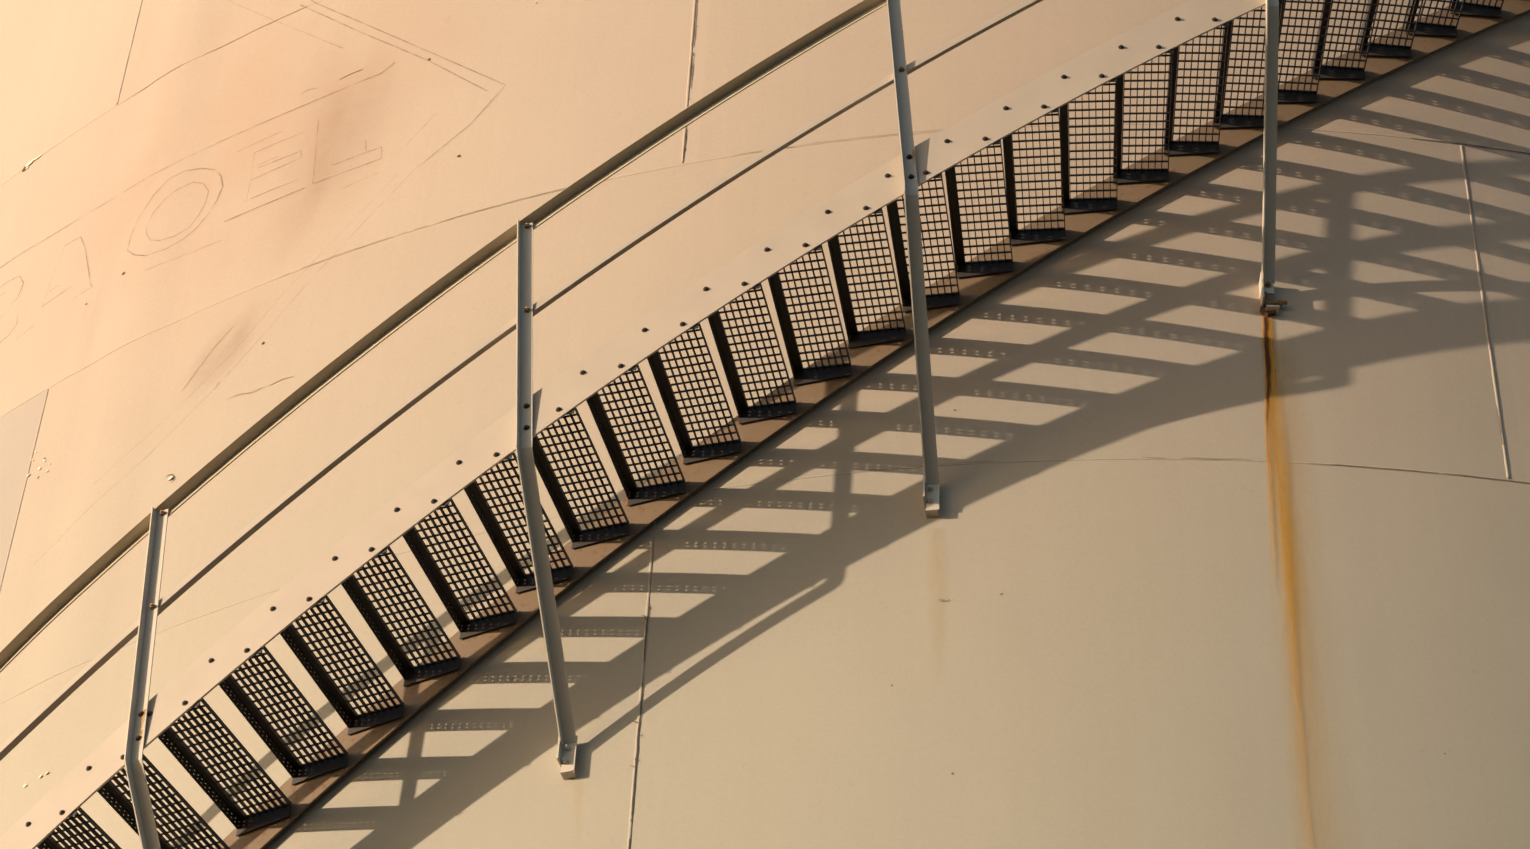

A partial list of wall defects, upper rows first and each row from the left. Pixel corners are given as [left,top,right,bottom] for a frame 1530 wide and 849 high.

corrosion [1262,317,1283,532]